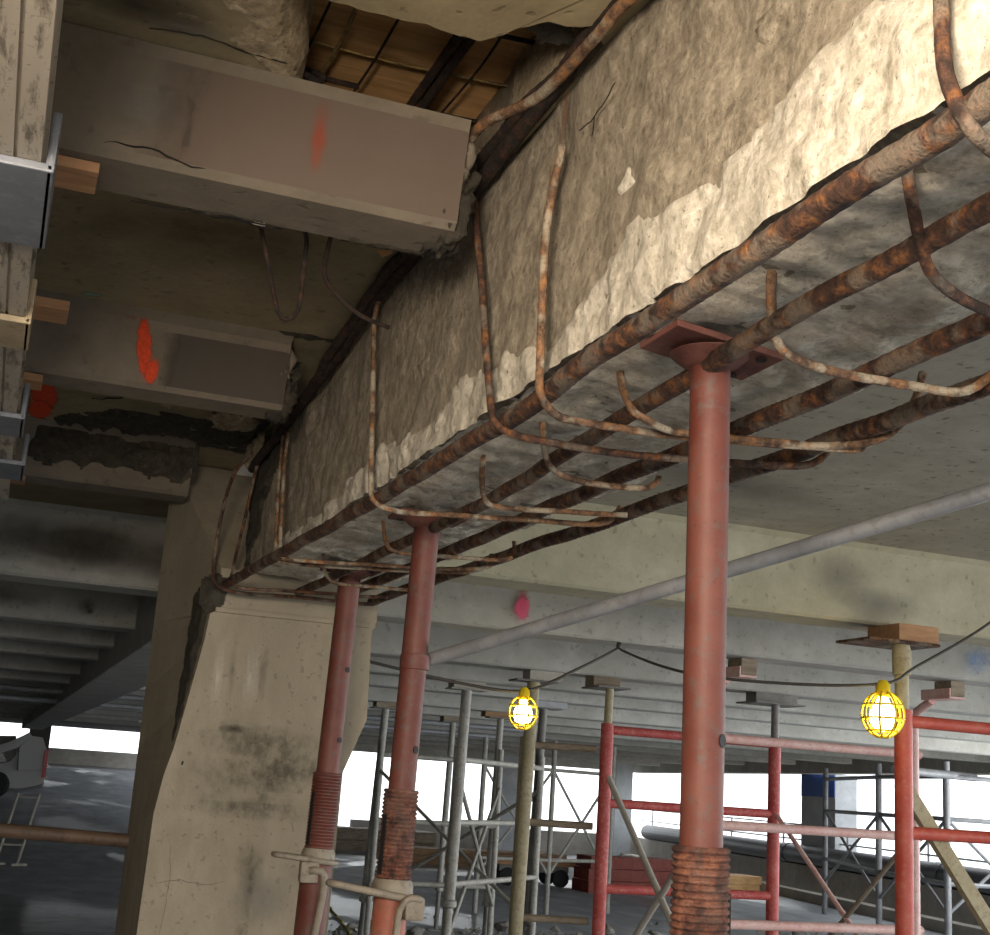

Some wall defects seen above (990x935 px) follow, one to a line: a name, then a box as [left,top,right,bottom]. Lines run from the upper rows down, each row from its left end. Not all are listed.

spalling [949,0,990,89]
crack [104,141,205,169]
spalling [915,137,990,228]
spalling [27,0,946,586]
spalling [730,223,990,422]